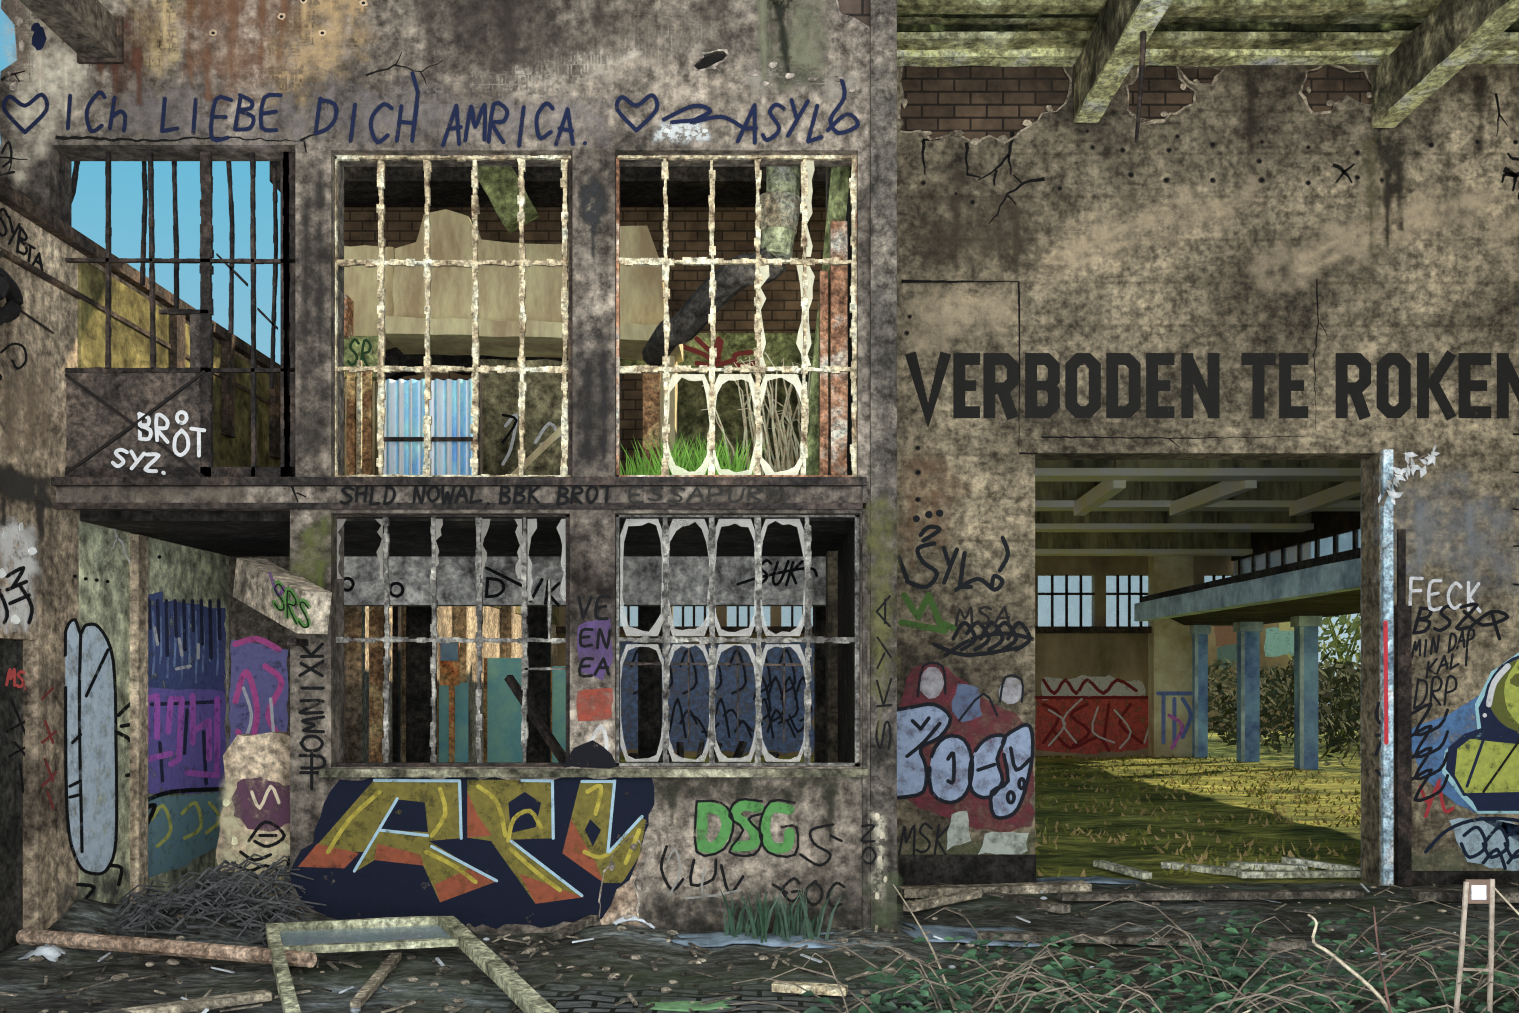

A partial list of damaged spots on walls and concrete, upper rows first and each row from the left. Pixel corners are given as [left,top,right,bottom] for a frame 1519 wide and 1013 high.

peeling [747,0,870,96]
spalling [897,65,1072,145]
spalling [1125,65,1223,125]
spalling [1299,64,1372,115]
crack [1495,93,1519,199]